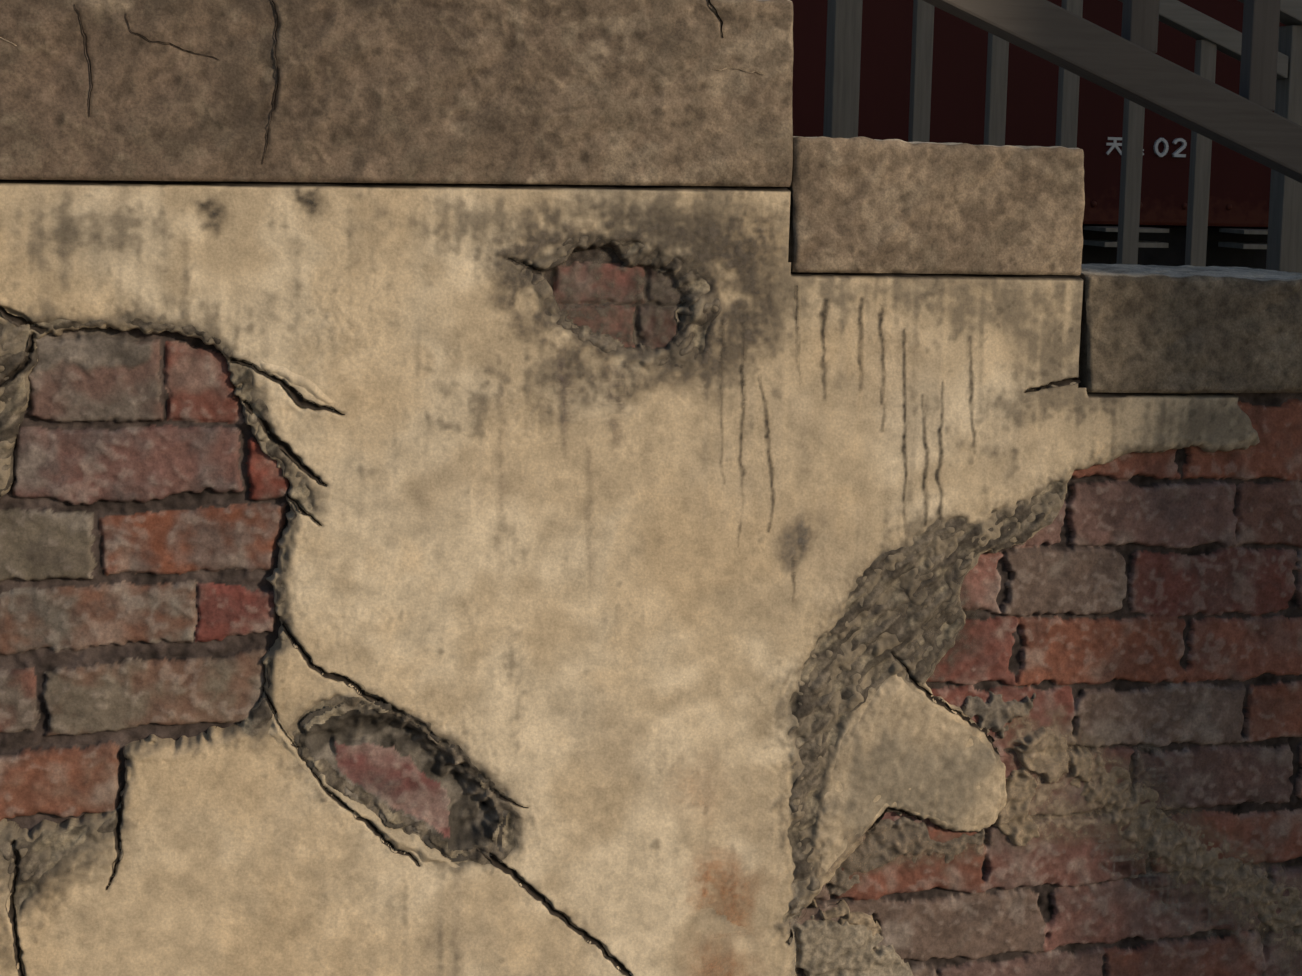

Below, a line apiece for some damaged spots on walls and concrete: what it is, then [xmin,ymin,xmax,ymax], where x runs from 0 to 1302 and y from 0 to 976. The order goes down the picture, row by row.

crack [74,4,93,117]
crack [125,13,219,60]
crack [262,0,279,164]
crack [0,306,46,387]
spalling [512,235,722,368]
water stain [923,414,943,525]
spalling [0,313,336,912]
spalling [782,393,1302,976]
crack [106,754,127,890]
spalling [292,696,520,865]
crack [6,841,24,976]
crack [478,849,633,976]